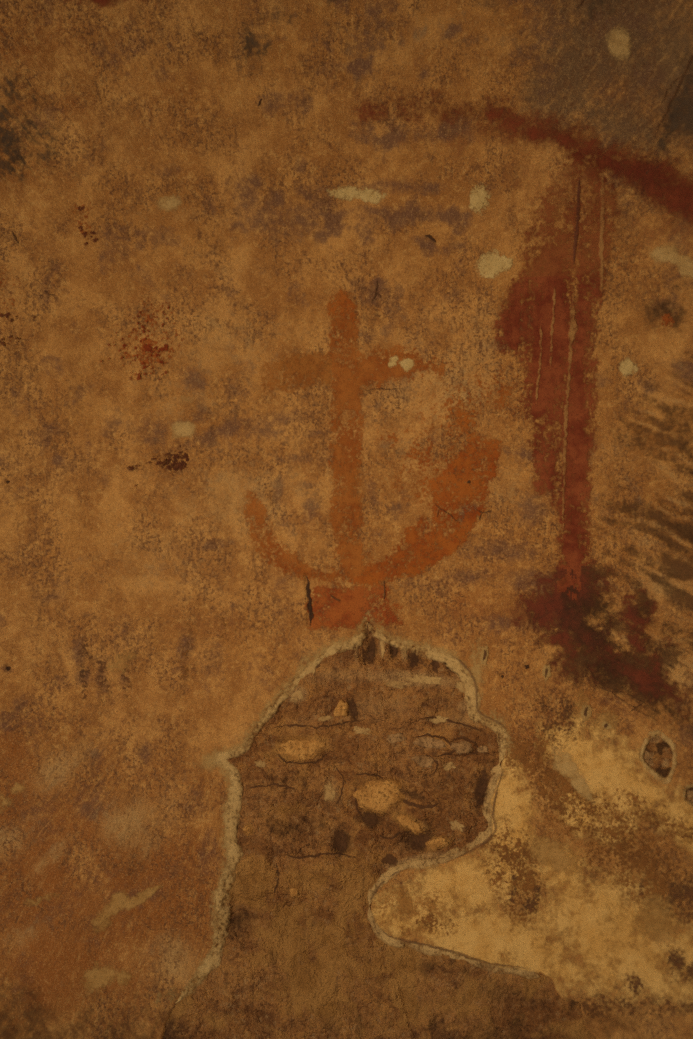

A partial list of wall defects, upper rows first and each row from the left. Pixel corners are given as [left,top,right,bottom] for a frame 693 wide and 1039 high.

crack [306,576,340,626]
damp [634,492,693,610]
spalling [156,610,693,1039]